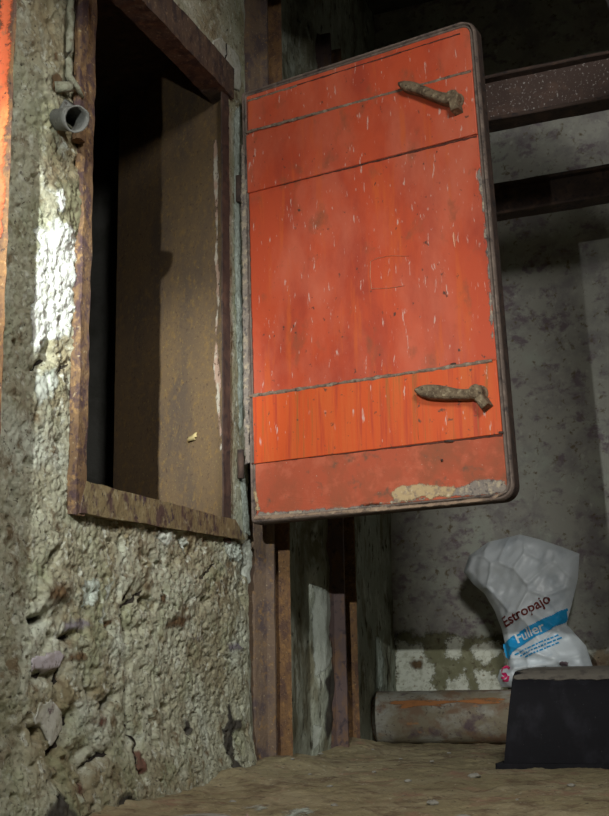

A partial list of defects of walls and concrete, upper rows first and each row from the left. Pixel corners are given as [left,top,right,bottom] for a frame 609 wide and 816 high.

peeling [394,630,509,691]